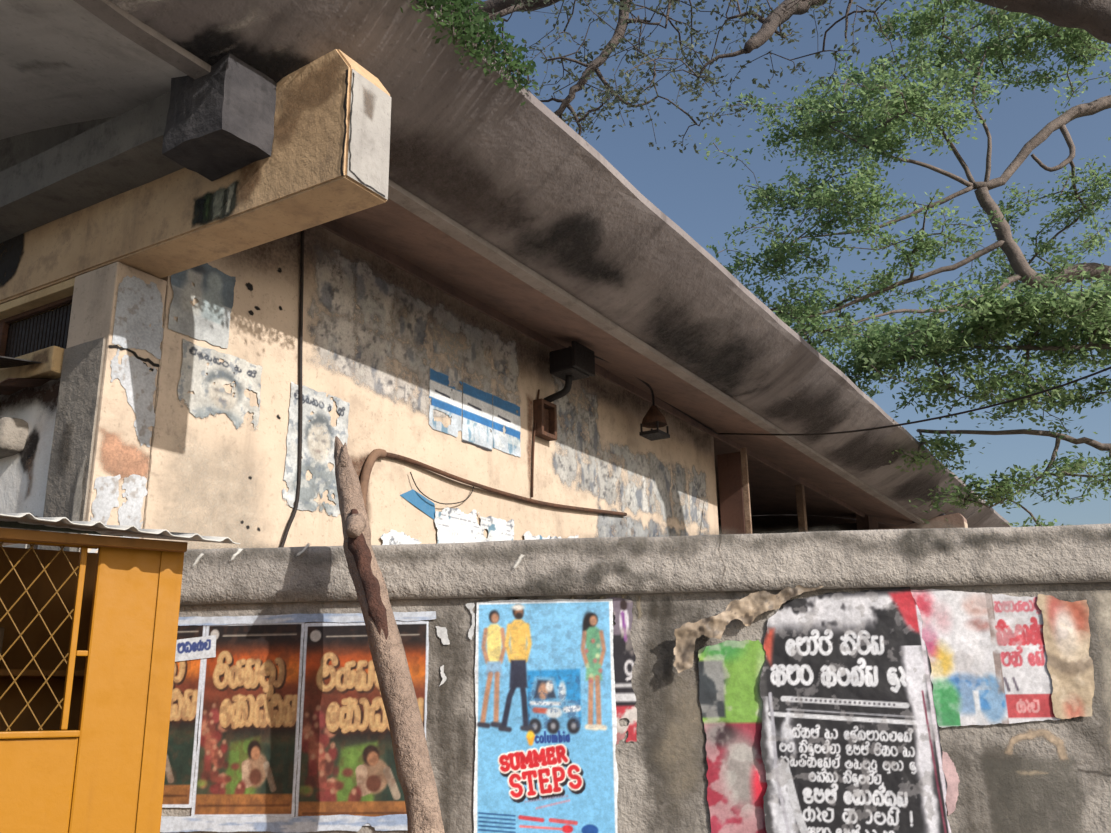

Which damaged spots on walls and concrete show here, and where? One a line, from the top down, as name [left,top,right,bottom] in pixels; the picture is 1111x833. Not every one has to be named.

leakage [174,12,339,139]
crack [340,69,385,197]
leakage [0,233,24,287]
leakage [389,137,623,283]
crack [109,345,160,371]
peeling [110,276,163,447]
leakage [653,307,753,396]
peeling [88,474,148,553]